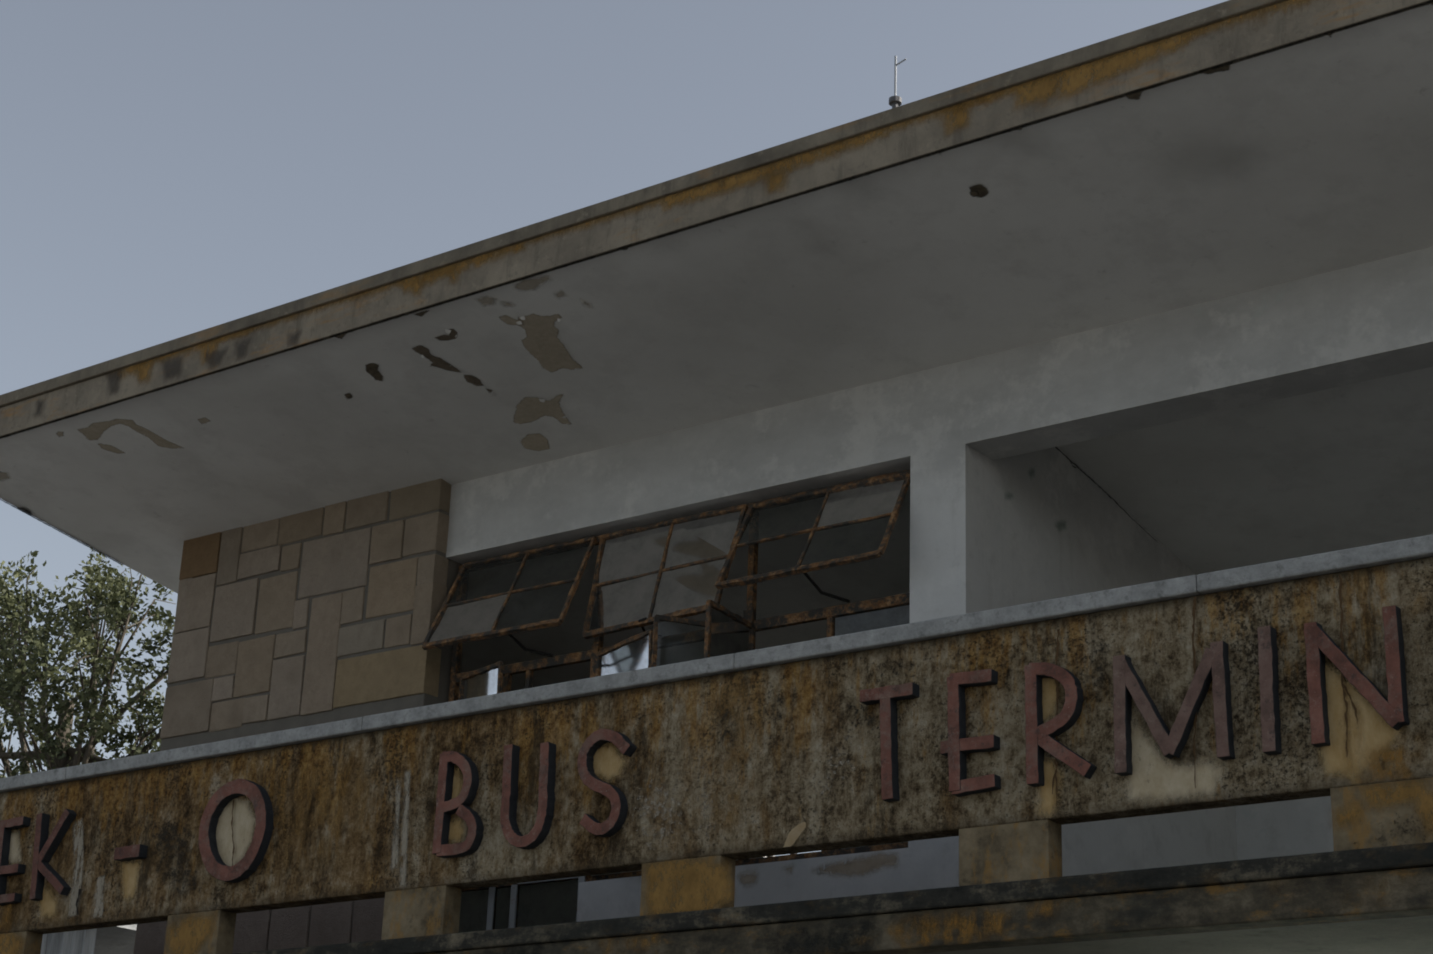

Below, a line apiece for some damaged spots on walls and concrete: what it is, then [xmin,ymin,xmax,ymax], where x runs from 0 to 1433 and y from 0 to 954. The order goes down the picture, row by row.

rust [268,0,1304,325]
peeling [412,329,492,393]
peeling [478,277,582,372]
peeling [56,419,181,454]
peeling [513,394,571,451]
water stain [69,820,104,917]
efflorescence [391,772,410,886]
water stain [1040,761,1060,815]